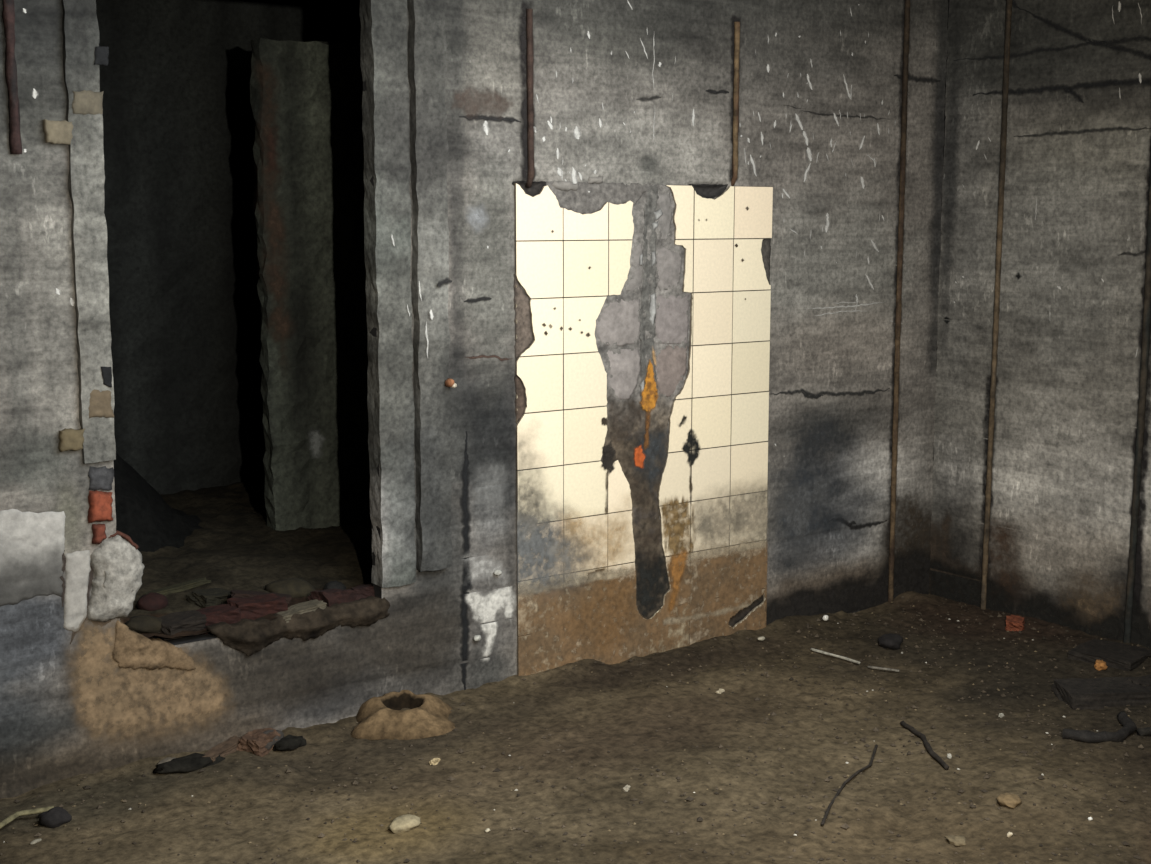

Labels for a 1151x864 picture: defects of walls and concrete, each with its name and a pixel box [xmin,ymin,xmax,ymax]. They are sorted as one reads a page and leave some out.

crack [894,0,1151,103]
peeling [534,116,580,142]
crack [1014,127,1151,137]
spalling [101,366,112,388]
spalling [512,148,691,619]
rust [634,351,658,468]
crack [773,388,890,399]
flaking render [0,466,139,633]
damp [466,416,1151,676]